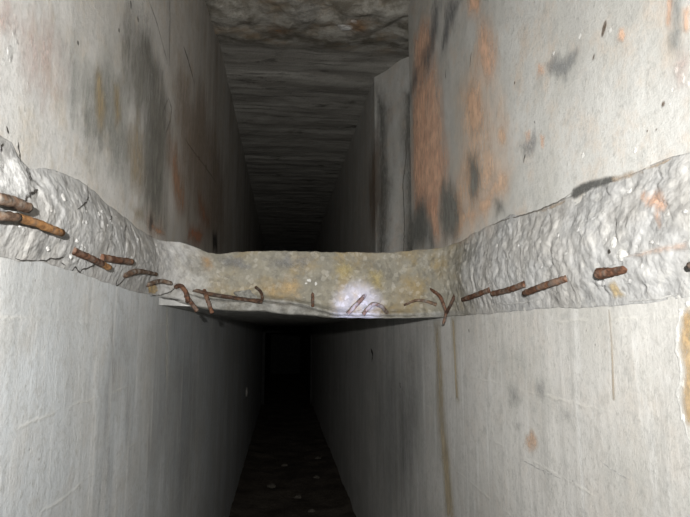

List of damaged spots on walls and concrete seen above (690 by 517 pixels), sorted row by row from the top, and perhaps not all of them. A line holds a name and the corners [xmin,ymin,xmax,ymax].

damp [125,22,166,228]
spalling [0,136,690,439]
corrosion [414,28,444,233]
damp [440,186,459,238]
damp [470,161,478,196]
damp [572,177,614,198]